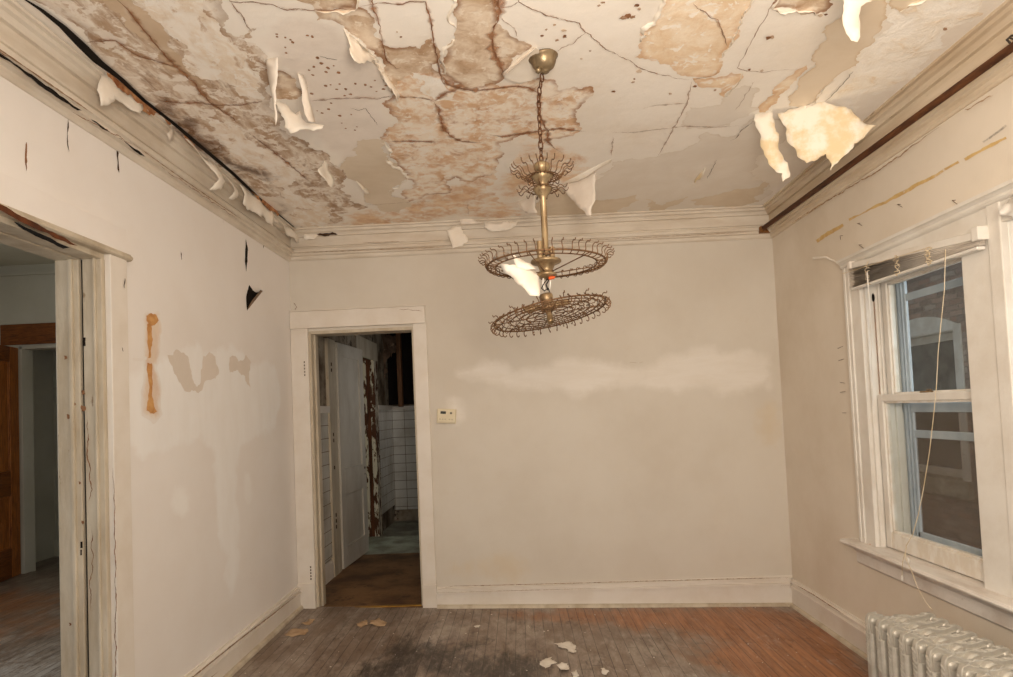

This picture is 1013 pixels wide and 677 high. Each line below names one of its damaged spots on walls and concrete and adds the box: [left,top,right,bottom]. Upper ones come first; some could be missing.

crack [67,112,125,171]
crack [87,3,306,179]
peeling [103,0,532,227]
damp [34,0,604,226]
crack [230,0,712,154]
crack [697,2,797,137]
peeling [535,0,987,216]
peeling [168,349,251,393]